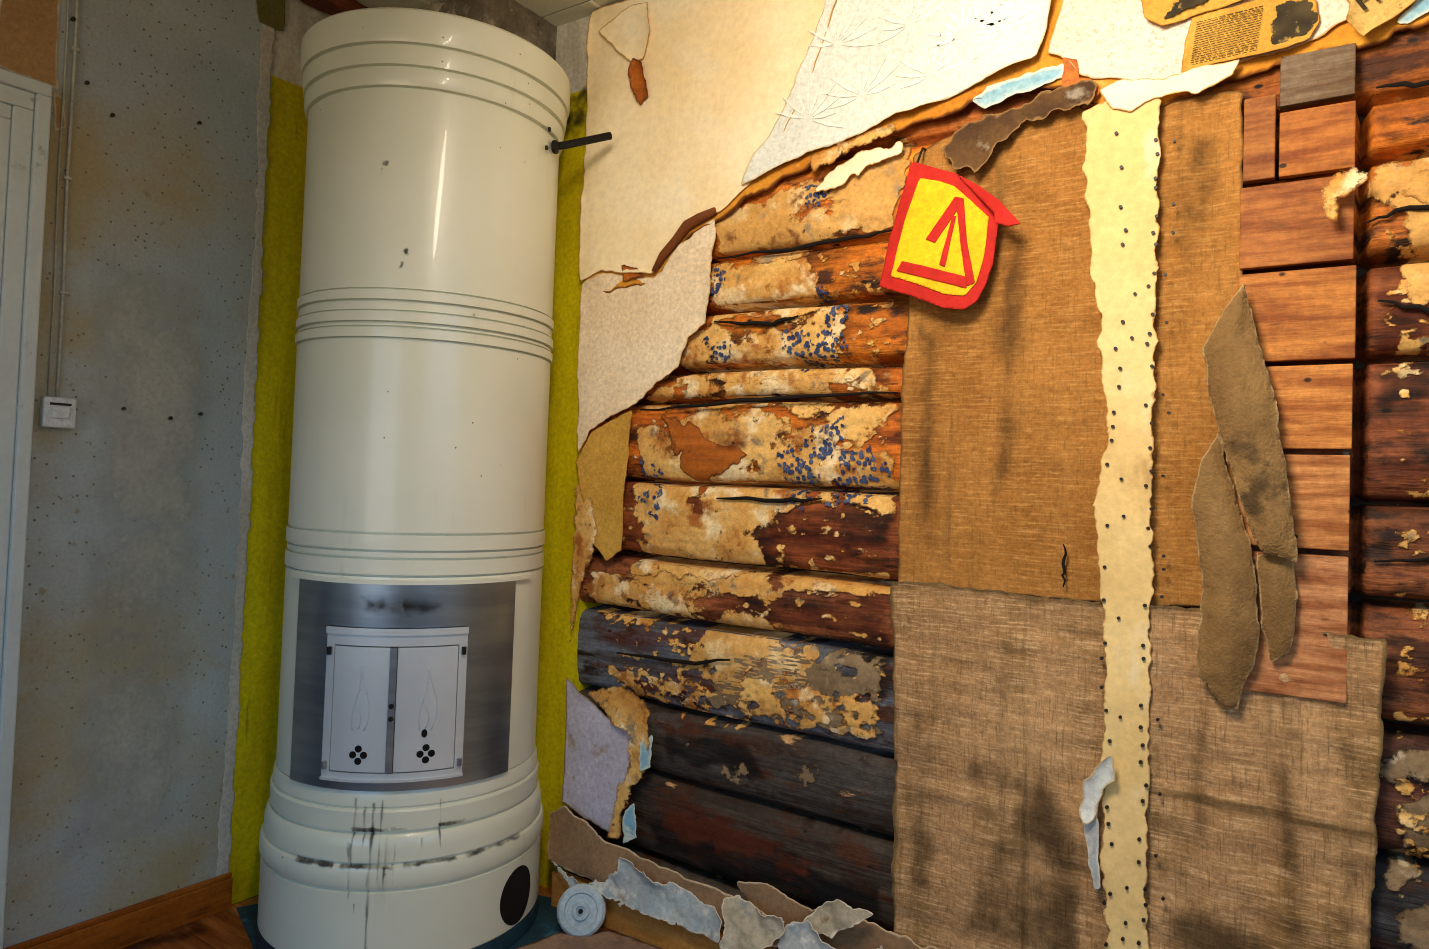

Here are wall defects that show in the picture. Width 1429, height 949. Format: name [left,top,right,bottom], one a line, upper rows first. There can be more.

peeling [1321,138,1429,306]
peeling [582,138,917,844]
damp [1028,787,1064,868]
peeling [1379,747,1429,892]
damp [1022,888,1075,949]
damp [1177,918,1256,949]
peeling [1395,904,1429,949]